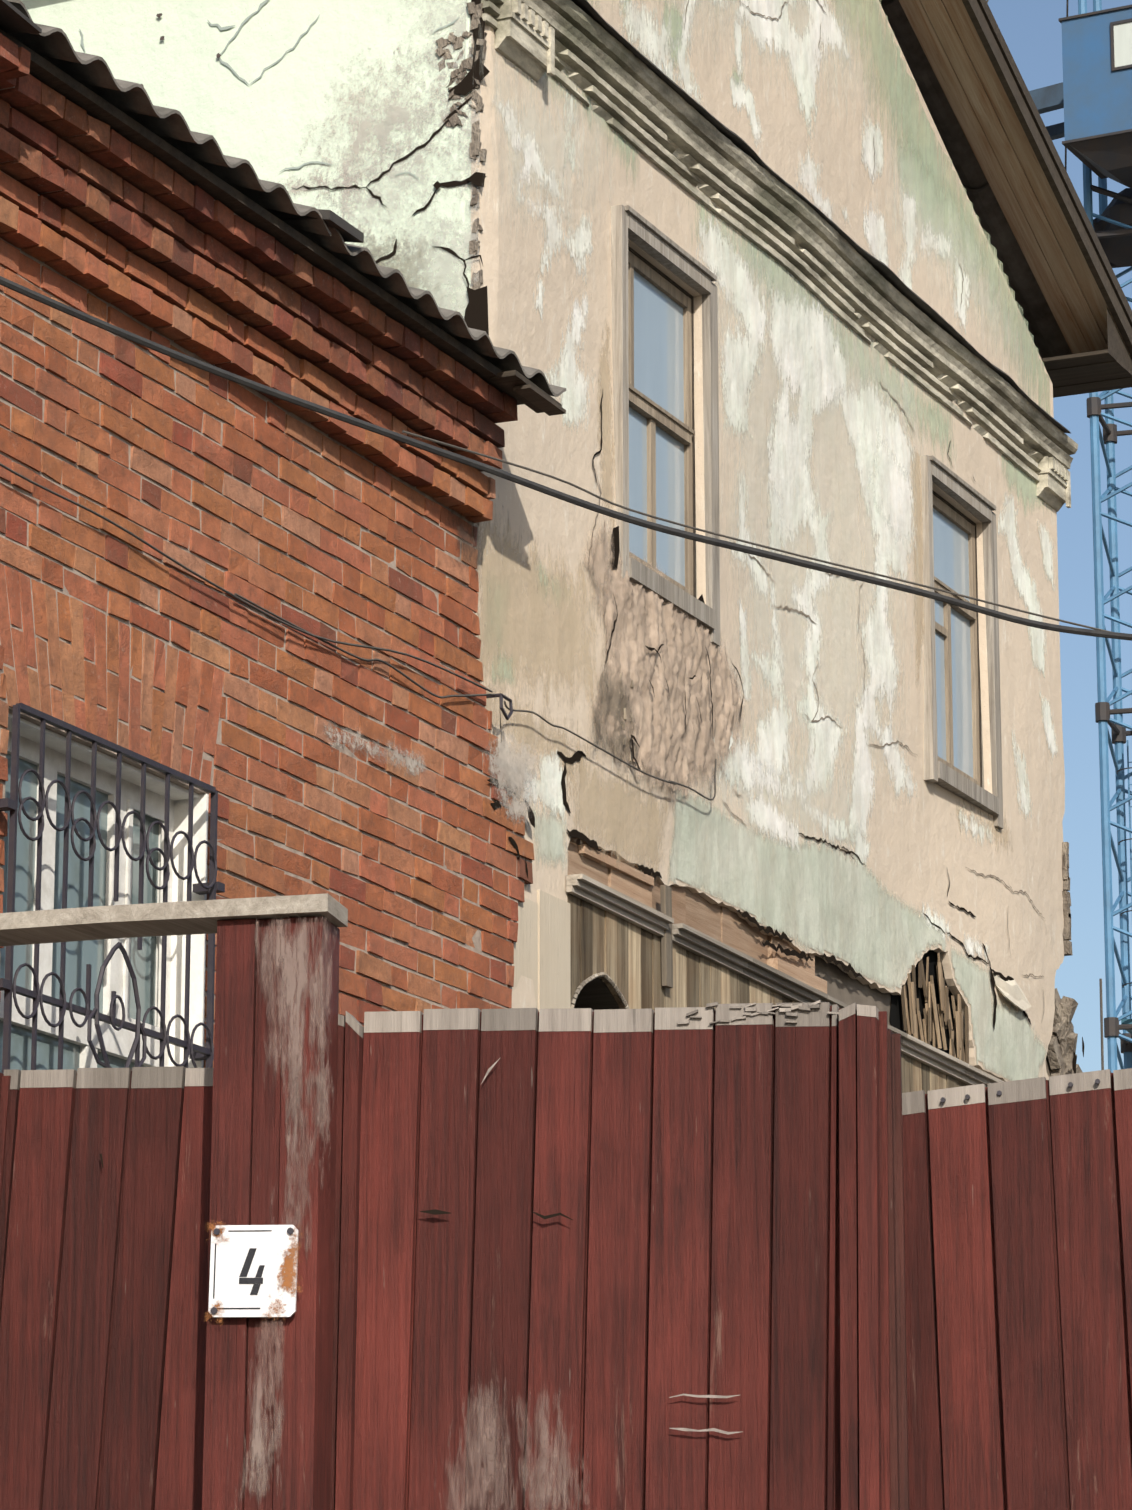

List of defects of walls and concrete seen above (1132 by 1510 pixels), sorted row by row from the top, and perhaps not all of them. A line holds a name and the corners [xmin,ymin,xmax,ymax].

crack [208,0,320,85]
crack [739,0,826,49]
crack [280,97,487,287]
peeling [619,0,970,333]
crack [587,395,603,585]
crack [733,542,816,624]
peeling [477,218,1084,1081]
crack [804,664,917,755]